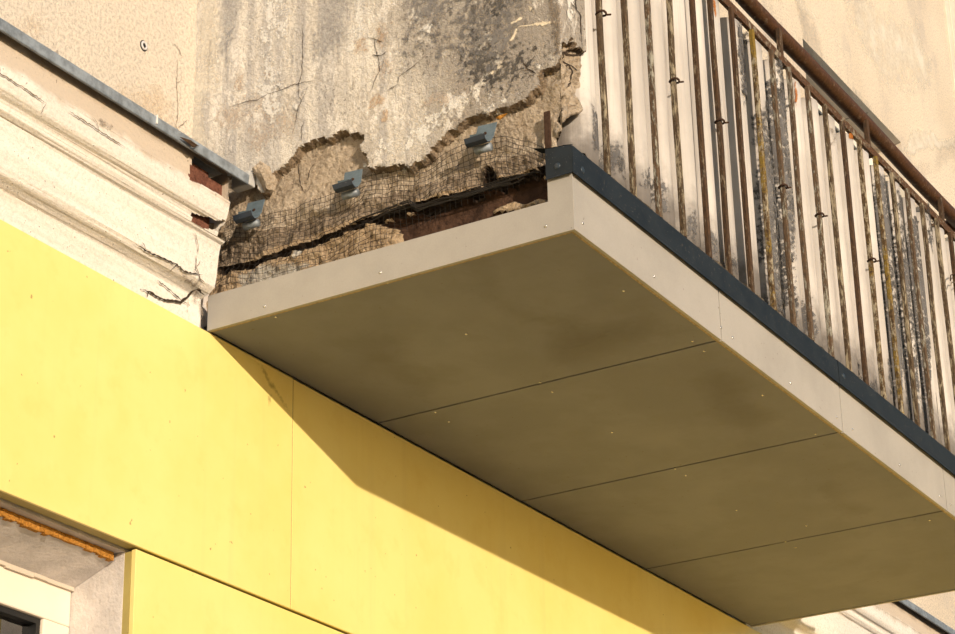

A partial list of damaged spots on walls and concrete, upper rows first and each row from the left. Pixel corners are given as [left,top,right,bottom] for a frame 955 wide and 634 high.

crack [236,20,315,191]
spalling [188,0,586,286]
crack [368,32,423,100]
leakage [403,0,547,96]
crack [136,237,204,304]